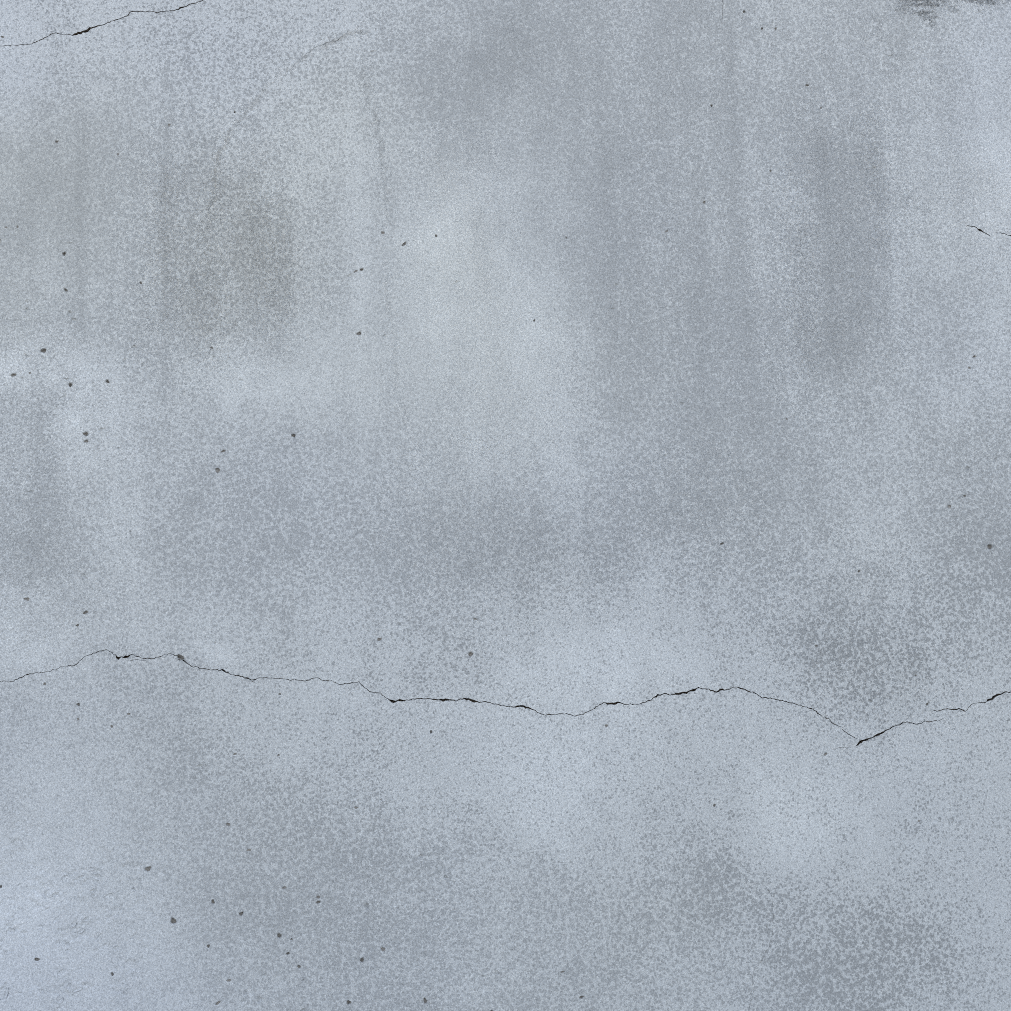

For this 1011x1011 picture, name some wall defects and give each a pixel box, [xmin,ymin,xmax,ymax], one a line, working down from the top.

crack [4,0,203,46]
crack [0,649,1011,750]